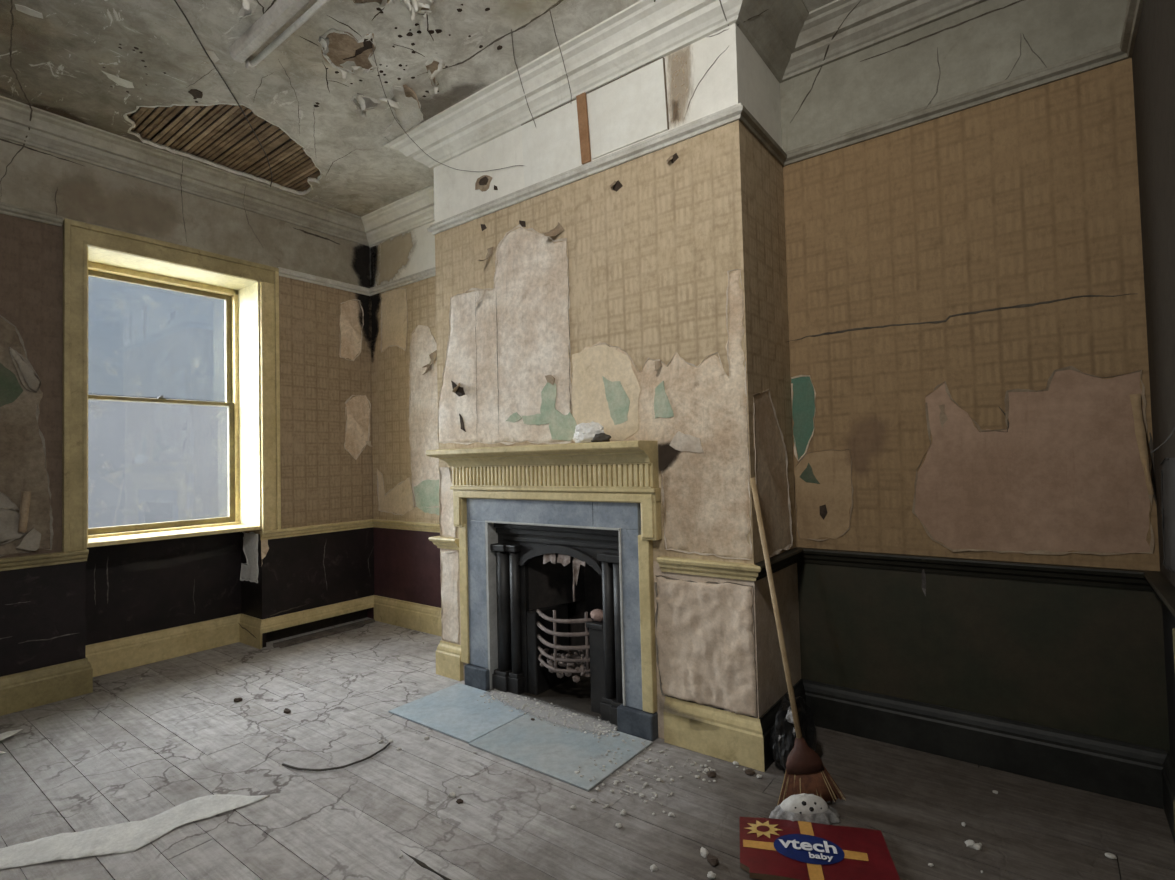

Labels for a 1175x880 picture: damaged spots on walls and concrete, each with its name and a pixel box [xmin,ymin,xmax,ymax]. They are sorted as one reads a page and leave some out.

crack [0,0,83,202]
flaking render [123,89,324,195]
crack [253,36,356,175]
crack [327,7,385,35]
peeling [318,0,451,143]
crack [394,0,563,76]
crack [684,10,767,118]
crack [790,3,859,123]
peeling [339,300,362,360]
peeling [377,228,853,560]
peeling [914,370,1175,572]
peeling [440,551,460,644]